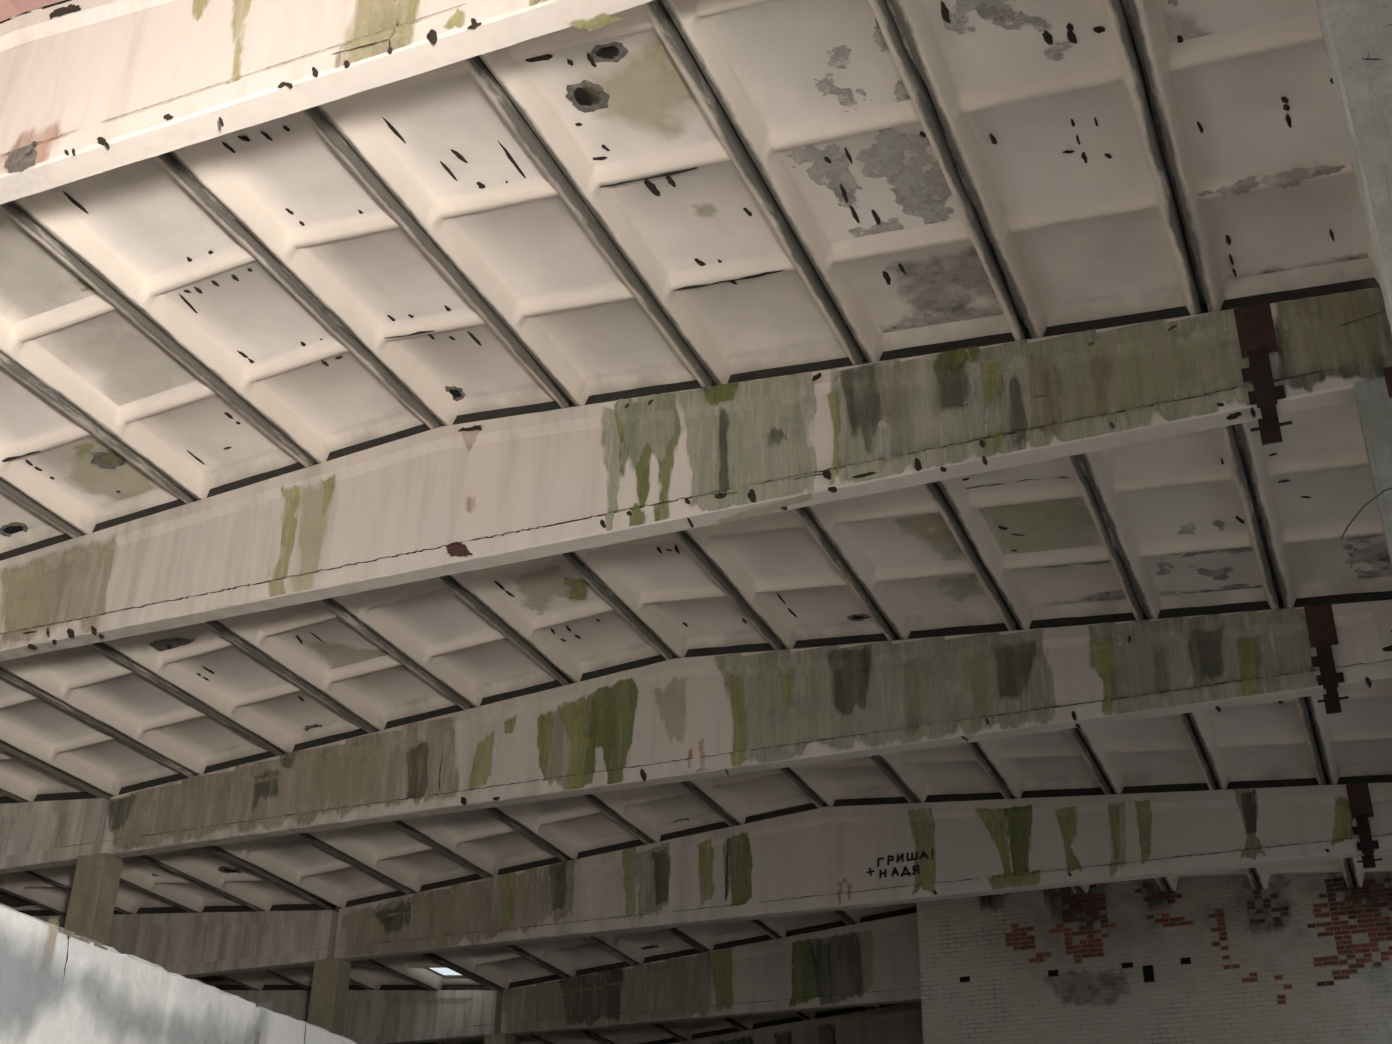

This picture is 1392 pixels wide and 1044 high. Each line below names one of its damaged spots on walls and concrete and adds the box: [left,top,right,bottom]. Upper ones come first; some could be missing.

peeling [941,0,1077,61]
peeling [789,128,953,237]
spalling [883,263,906,285]
leakage [1276,287,1392,391]
leakage [832,308,1257,483]
leakage [602,372,816,531]
leakage [571,678,638,789]
leakage [716,629,1056,763]
leakage [1089,607,1313,716]
flaking render [1005,872,1116,963]
flaking render [1135,883,1292,1004]
flaking render [1307,878,1392,986]